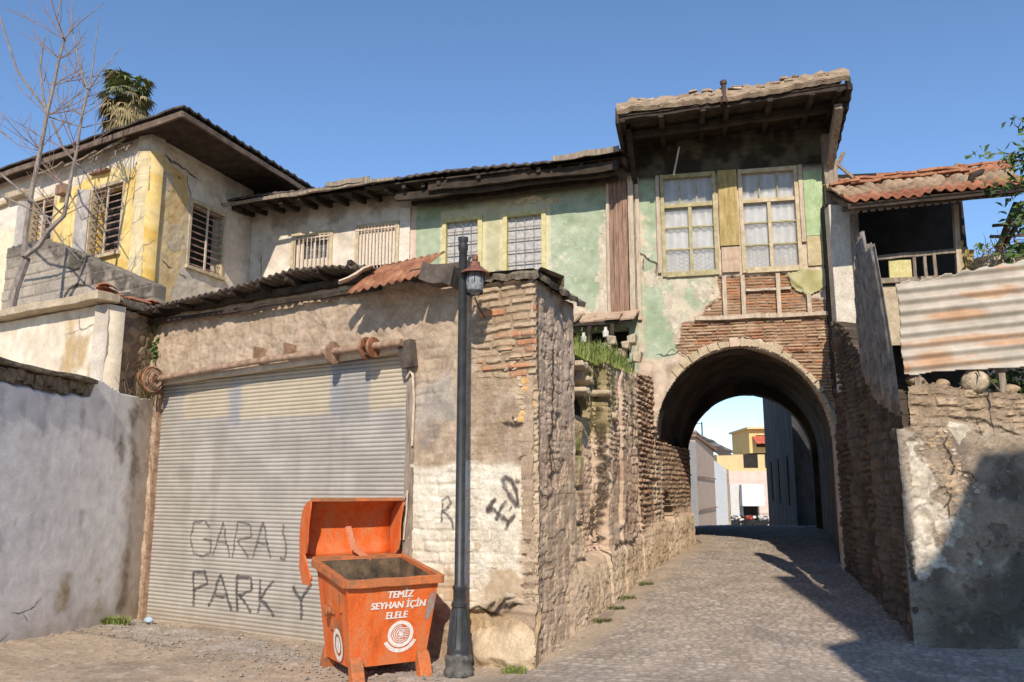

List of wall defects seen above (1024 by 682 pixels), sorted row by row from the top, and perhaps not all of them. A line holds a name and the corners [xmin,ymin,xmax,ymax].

crack [165,155,201,194]
flaking render [495,328,535,423]
flaking render [643,267,836,409]
peeling [905,421,980,580]
crack [938,416,1023,533]